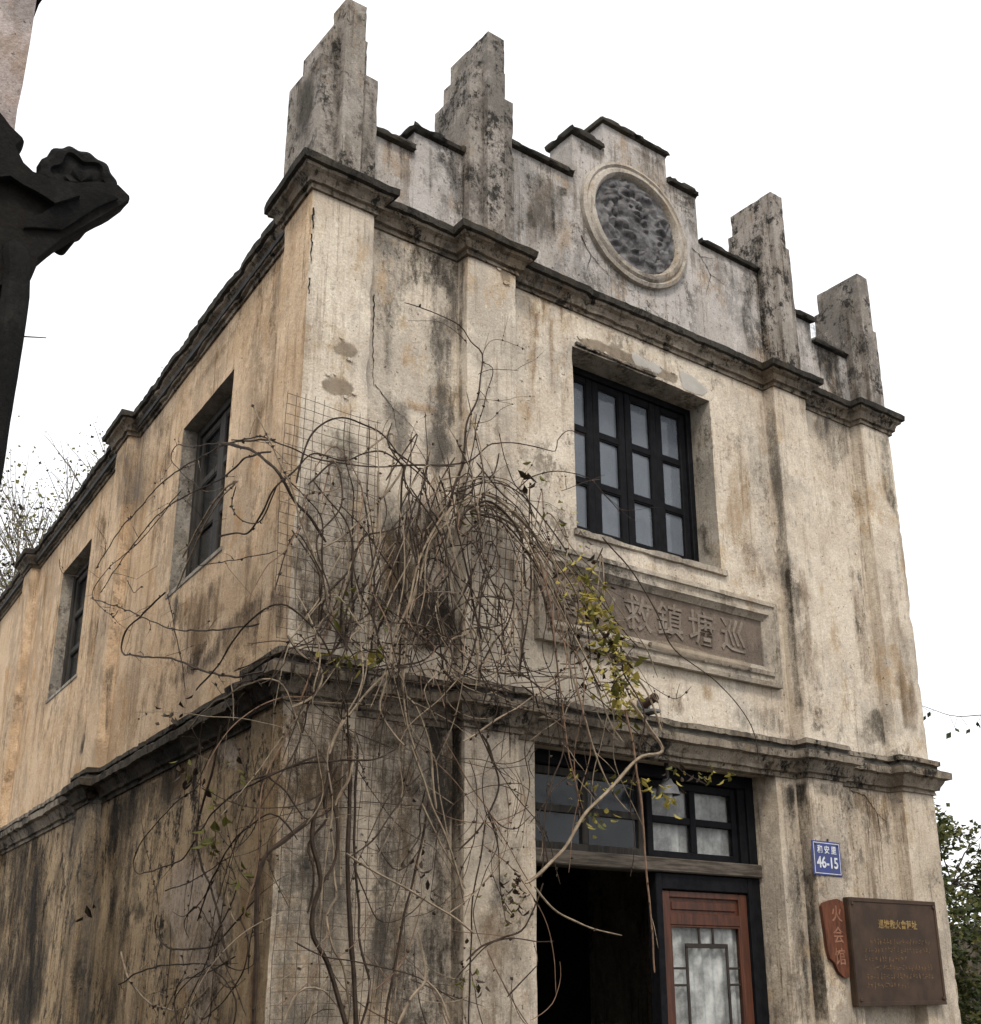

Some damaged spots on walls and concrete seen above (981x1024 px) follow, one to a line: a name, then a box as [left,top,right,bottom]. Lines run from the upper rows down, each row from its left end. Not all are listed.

water stain [296,82,312,140]
crack [307,207,315,294]
water stain [732,260,769,347]
crack [372,295,422,441]
spalling [577,335,678,382]
water stain [769,427,811,658]
water stain [869,710,885,742]
water stain [900,675,917,726]
water stain [0,842,47,1024]
water stain [64,761,190,1024]